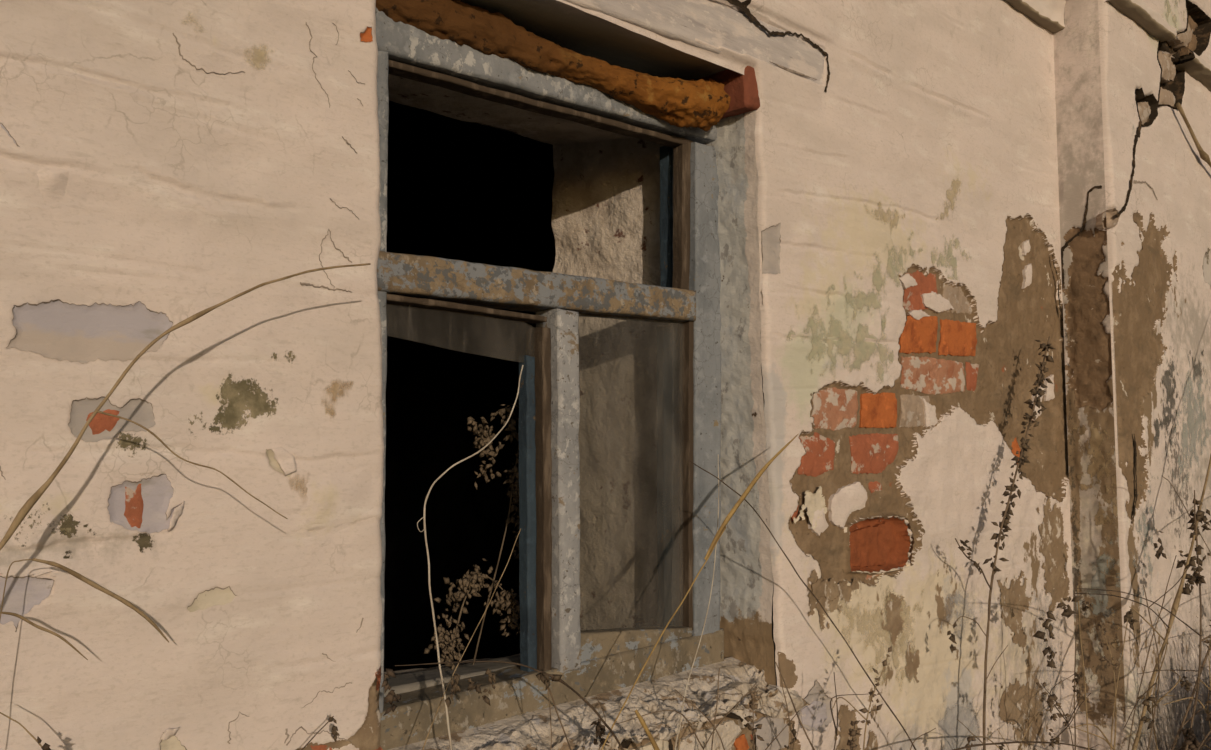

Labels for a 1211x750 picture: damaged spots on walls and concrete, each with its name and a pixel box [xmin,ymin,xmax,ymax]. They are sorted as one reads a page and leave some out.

crack [173,33,245,75]
crack [711,0,830,92]
crack [1052,119,1158,316]
spalling [1202,248,1211,288]
peeling [6,299,173,364]
peeling [68,396,156,442]
mould [190,374,278,434]
spalling [789,208,1178,683]
peeling [107,474,185,534]
peeling [0,576,54,632]
spalling [777,652,798,689]
spalling [616,680,878,750]